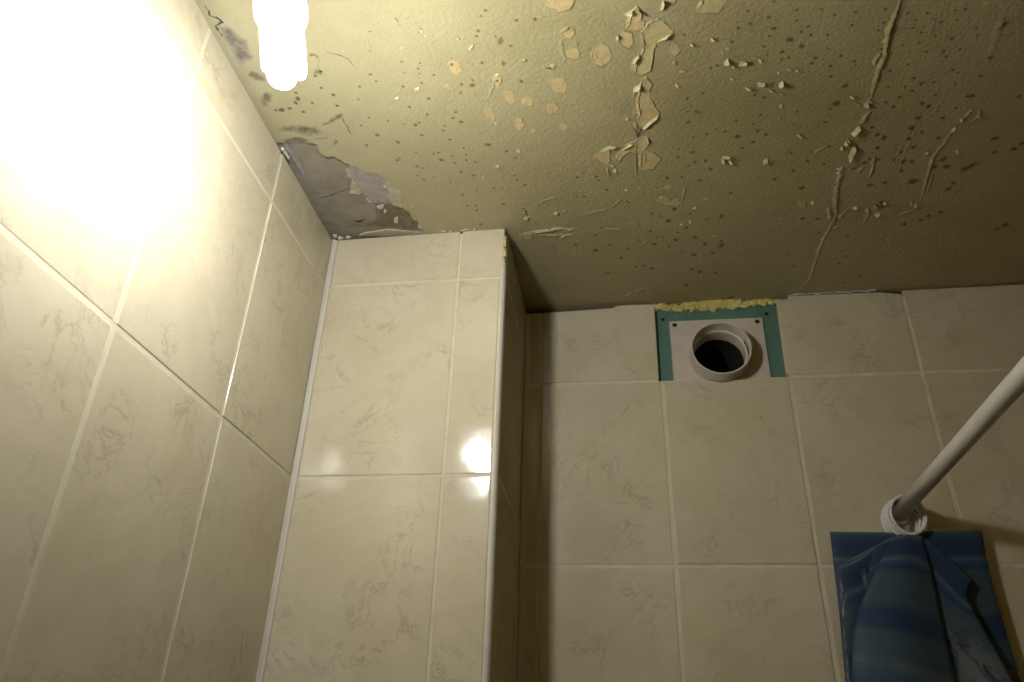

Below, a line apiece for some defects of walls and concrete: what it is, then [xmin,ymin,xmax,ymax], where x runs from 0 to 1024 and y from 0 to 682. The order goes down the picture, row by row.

water stain [226,30,248,59]
peeling [484,0,693,175]
peeling [710,37,762,80]
peeling [745,68,802,141]
crack [792,0,982,293]
spalling [276,136,446,241]
peeling [519,227,585,240]